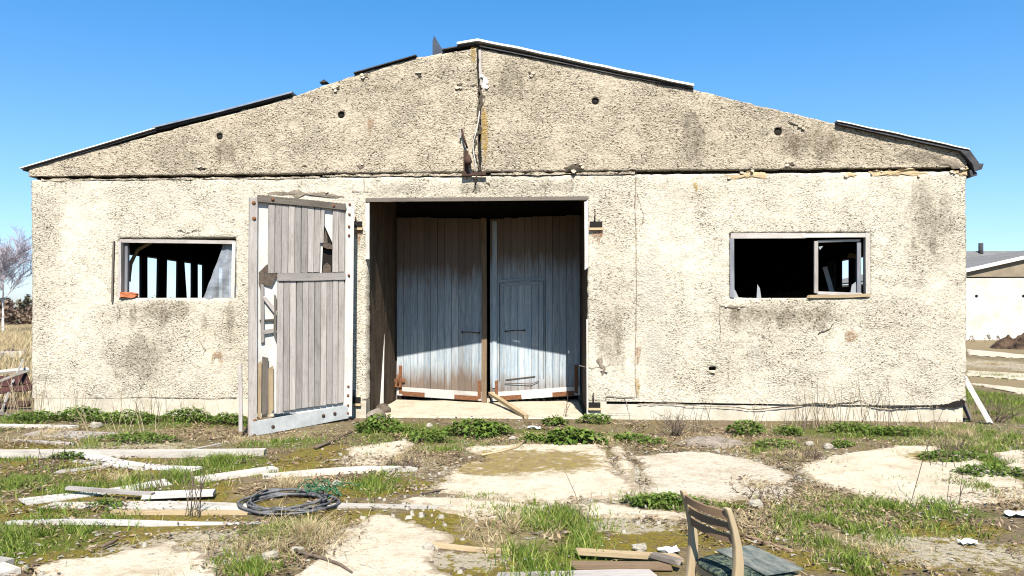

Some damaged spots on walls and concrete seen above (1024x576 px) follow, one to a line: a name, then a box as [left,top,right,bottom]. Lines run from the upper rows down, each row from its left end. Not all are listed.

spalling [725,169,768,180]
spalling [844,152,969,178]
crack [605,172,965,415]